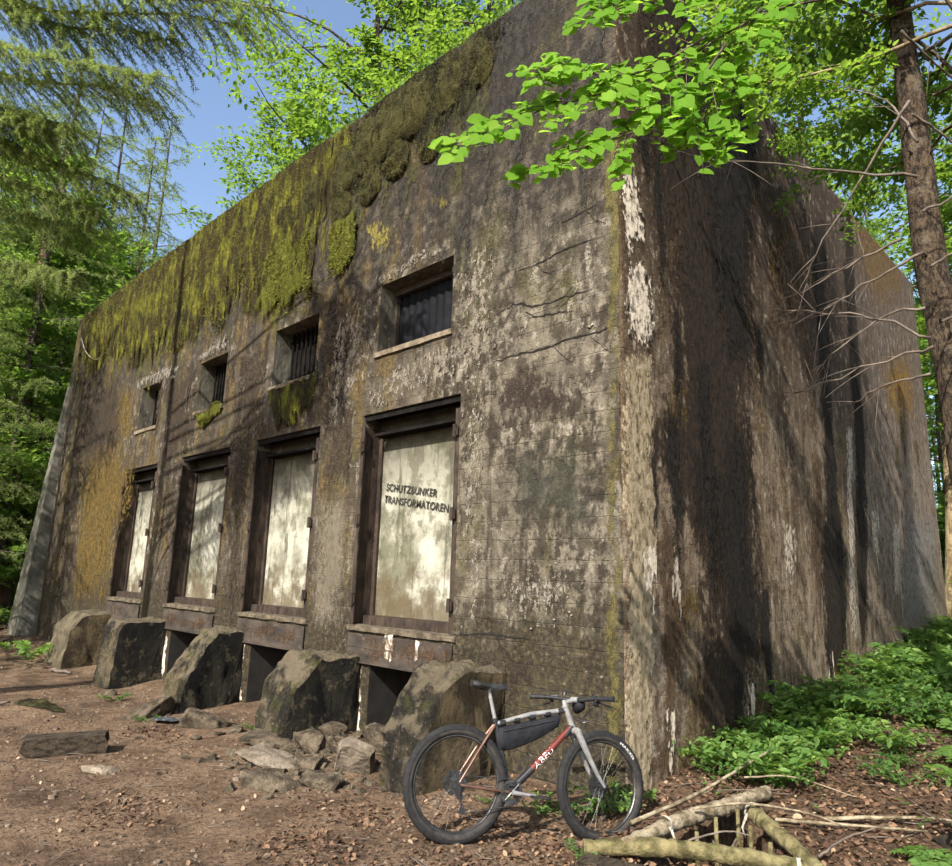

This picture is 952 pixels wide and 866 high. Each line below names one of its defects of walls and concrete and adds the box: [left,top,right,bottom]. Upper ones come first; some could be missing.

crack [497,193,606,318]
crack [494,325,618,362]
leakage [622,0,881,780]
leakage [892,524,904,618]